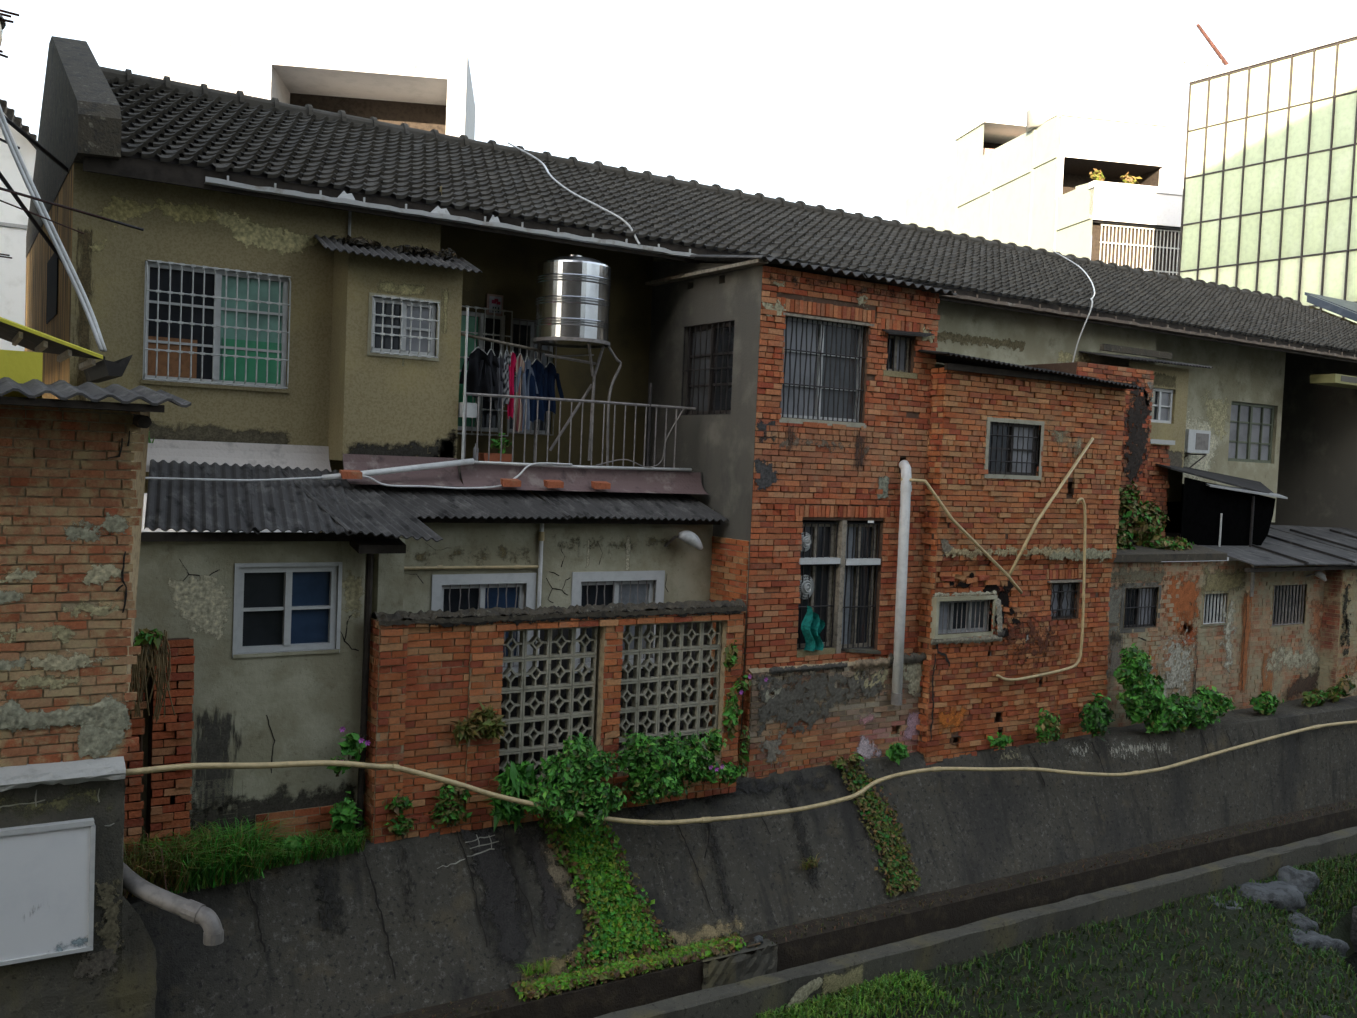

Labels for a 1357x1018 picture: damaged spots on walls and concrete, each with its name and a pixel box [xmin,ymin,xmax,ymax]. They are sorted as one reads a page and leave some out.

crack [546,549,570,603]